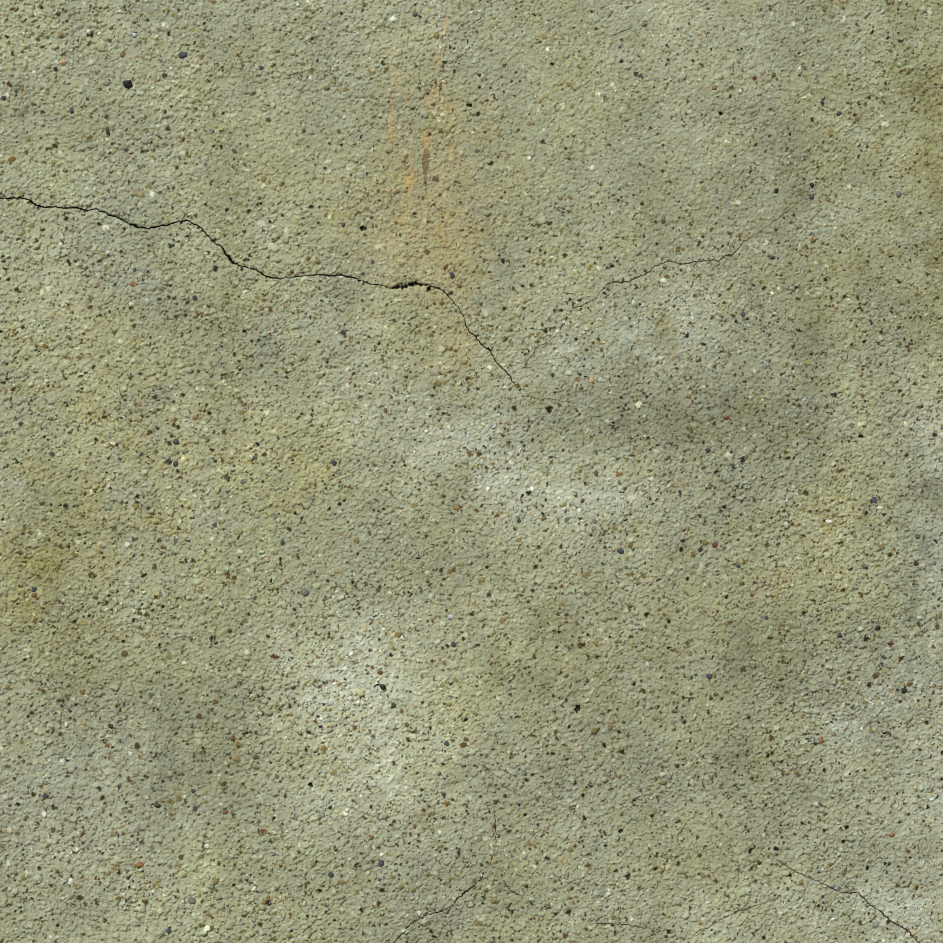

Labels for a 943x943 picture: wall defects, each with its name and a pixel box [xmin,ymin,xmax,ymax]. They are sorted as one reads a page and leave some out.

crack [0,186,818,403]